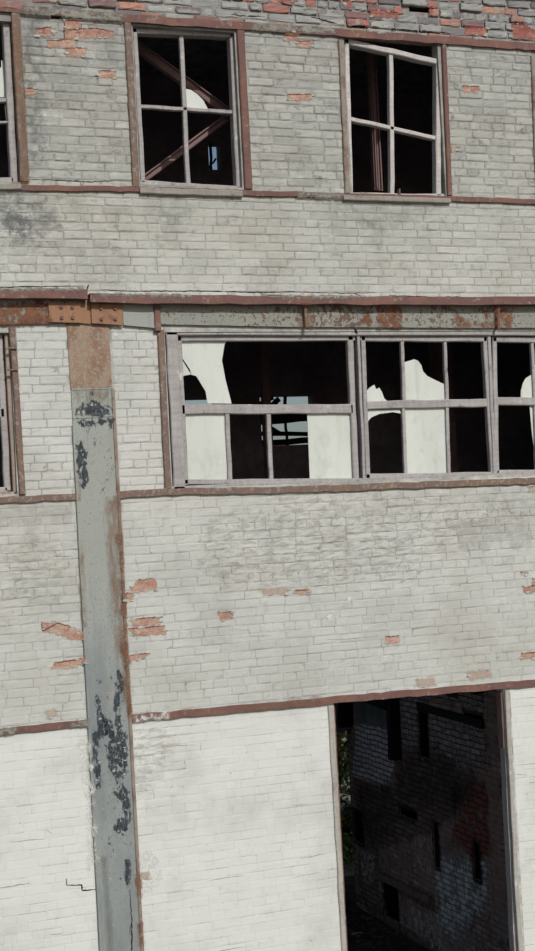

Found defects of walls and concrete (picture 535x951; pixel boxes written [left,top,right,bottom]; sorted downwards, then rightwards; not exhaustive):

flaking render [24,0,124,57]
rust [0,303,51,326]
rust [363,306,402,330]
rust [456,305,512,329]
peeling [75,391,115,489]
flaking render [123,577,158,603]
flaking render [520,571,535,593]
flaking render [41,621,84,641]
flaking render [129,616,168,636]
peeling [50,658,132,873]
peeling [120,855,152,885]
crack [127,895,135,951]